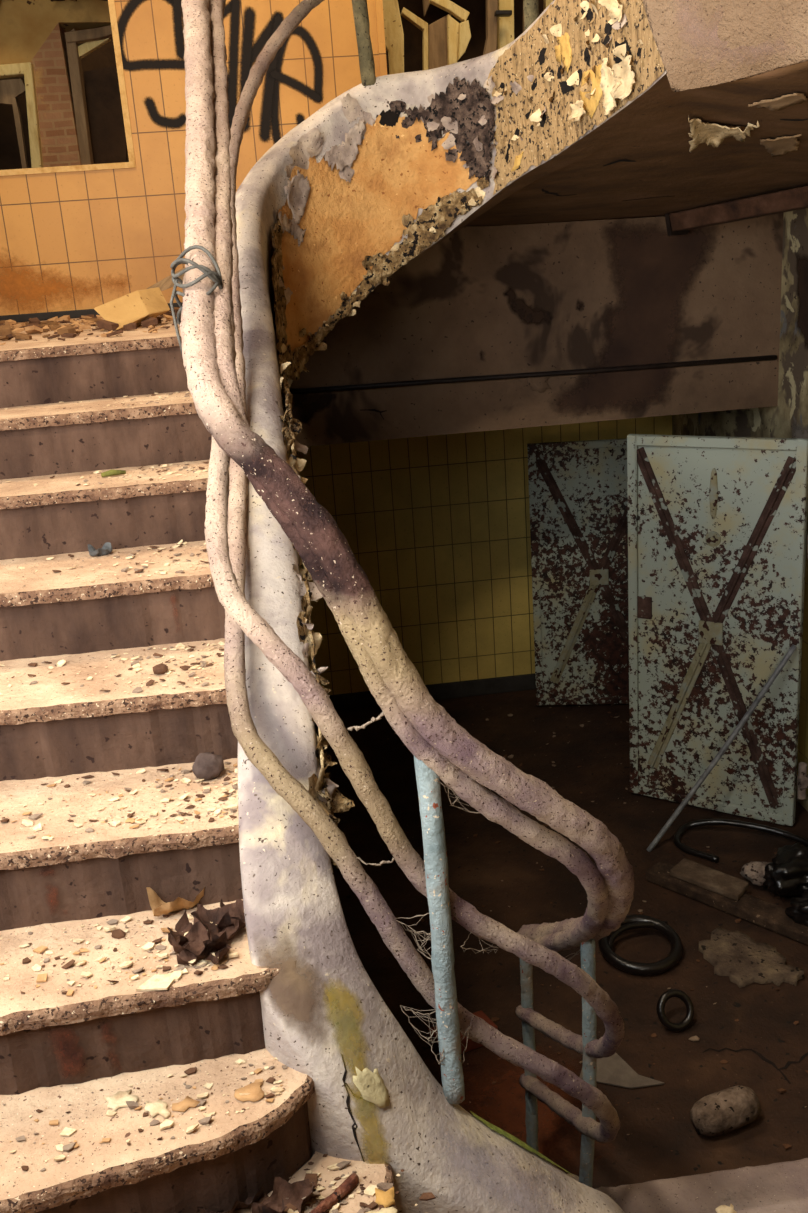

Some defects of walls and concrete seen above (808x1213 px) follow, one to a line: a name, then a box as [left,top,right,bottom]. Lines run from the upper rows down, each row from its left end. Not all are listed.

flaking render [688,93,808,157]
peeling [271,76,498,483]
peeling [503,287,553,325]
damp [556,224,715,415]
damp [796,255,808,348]
damp [794,426,808,439]
peeling [292,544,331,696]
peeling [308,717,355,826]
damp [259,942,386,1164]
crack [341,1054,365,1162]